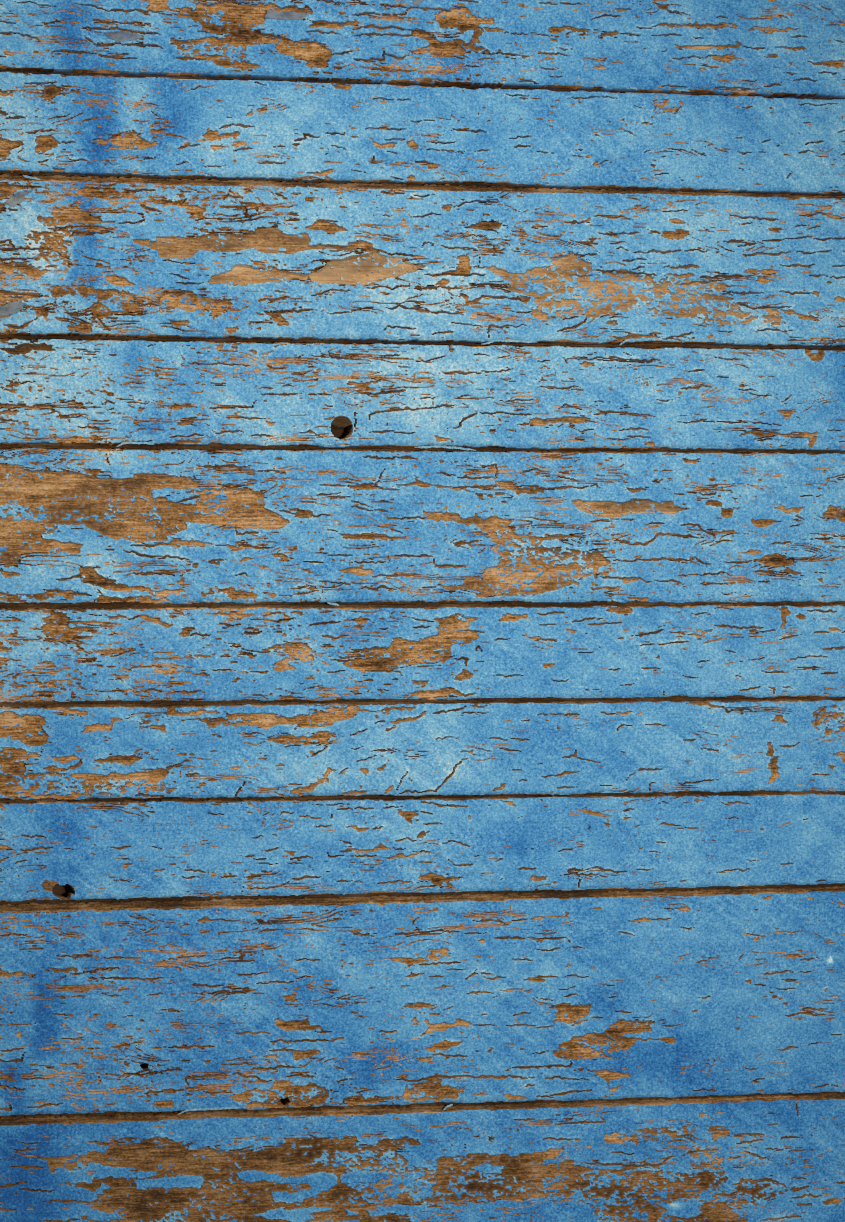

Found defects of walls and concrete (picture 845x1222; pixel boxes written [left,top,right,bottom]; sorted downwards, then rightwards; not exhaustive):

peeling [145,0,362,93]
peeling [405,0,506,59]
peeling [0,134,66,174]
peeling [0,186,820,355]
peeling [0,340,60,368]
peeling [750,501,845,530]
peeling [744,548,825,585]
peeling [0,451,737,812]
peeling [763,739,784,787]
peeling [808,702,845,766]
peeling [550,999,678,1094]
peeling [37,1110,844,1222]